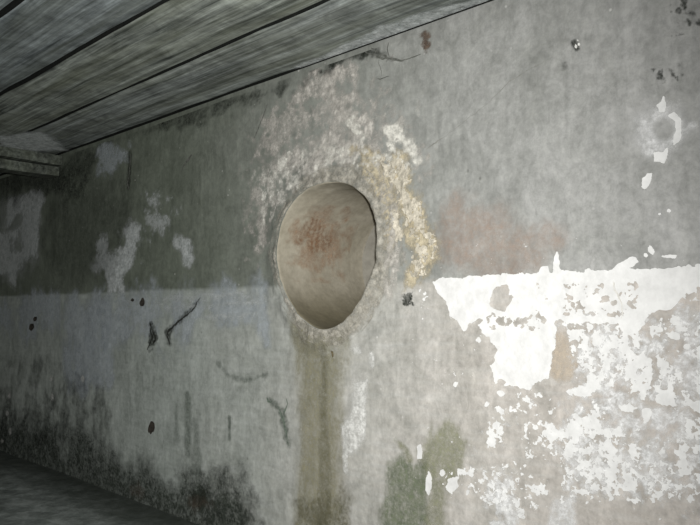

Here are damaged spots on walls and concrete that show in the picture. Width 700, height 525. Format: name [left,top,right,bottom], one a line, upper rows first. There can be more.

leakage [251,63,429,253]
peeling [641,173,652,189]
peeling [640,96,696,164]
crack [147,298,200,350]
leakage [0,406,249,525]
leakage [292,324,368,525]
peeling [433,245,700,525]